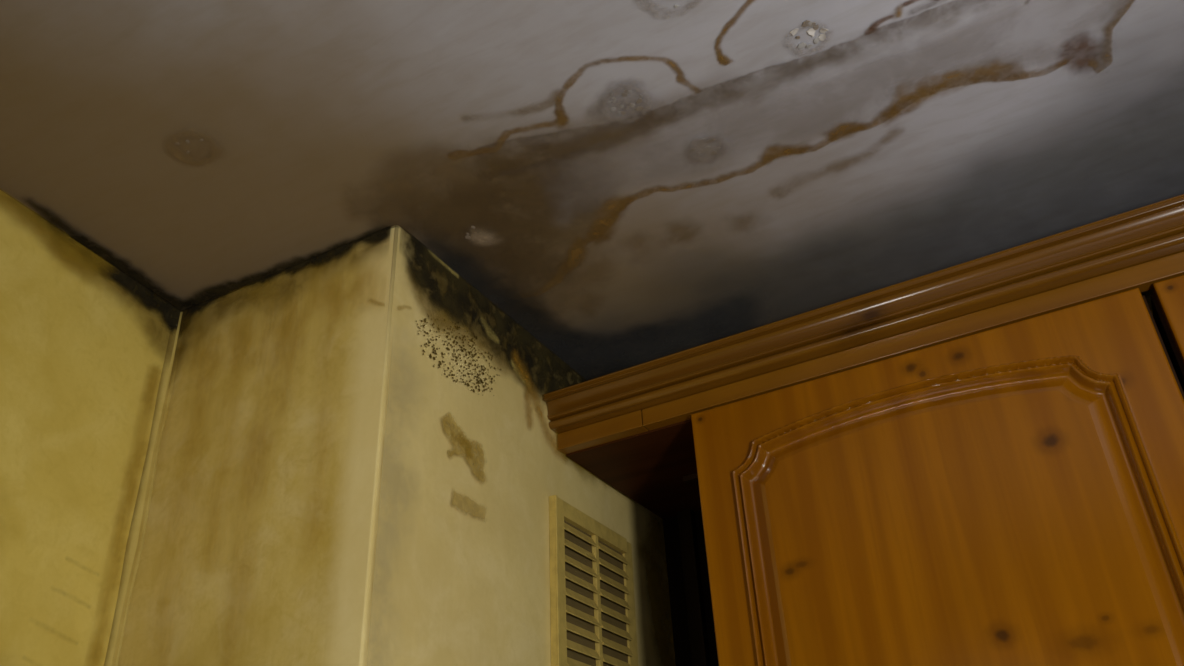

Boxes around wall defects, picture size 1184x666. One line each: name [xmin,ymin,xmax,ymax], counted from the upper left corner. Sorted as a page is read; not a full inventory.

damp [715,0,754,65]
damp [1055,0,1134,72]
damp [4,57,1184,394]
peeling [442,413,486,482]